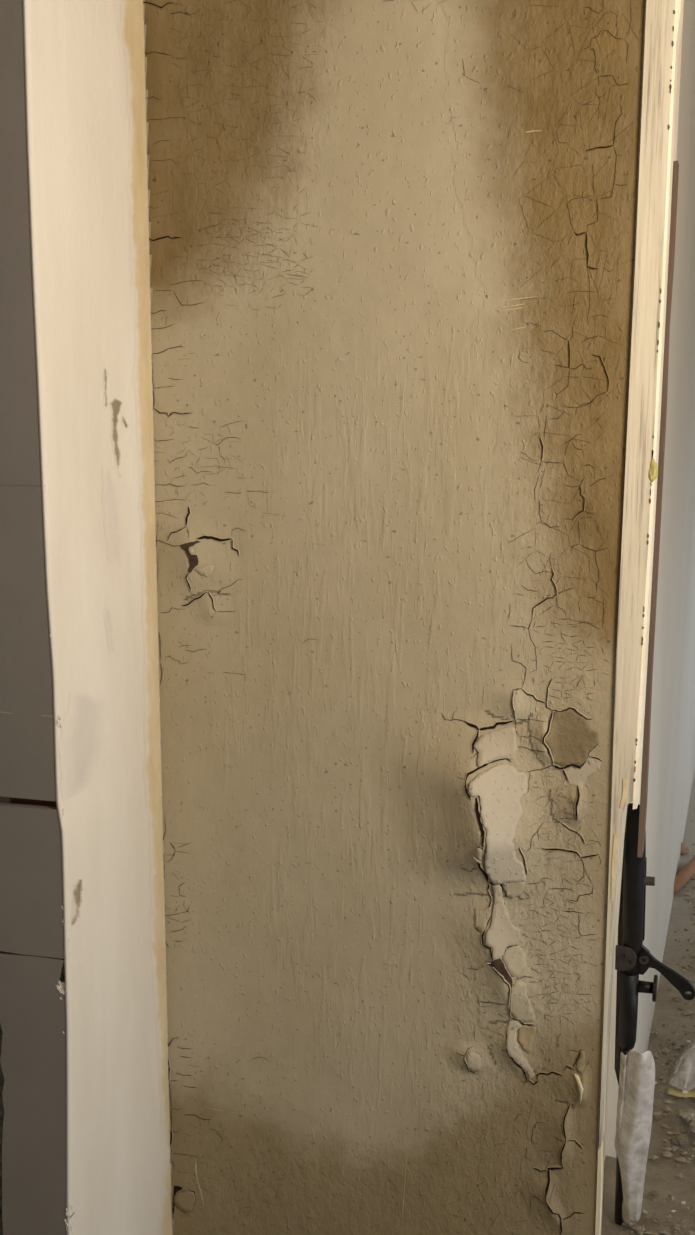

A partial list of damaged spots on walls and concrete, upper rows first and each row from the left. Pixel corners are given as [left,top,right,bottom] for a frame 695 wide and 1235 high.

damp [118,0,602,1235]
peeling [469,726,536,1080]
crack [441,0,641,1235]
damp [438,0,645,942]
peeling [573,1050,586,1104]
peeling [565,757,601,790]